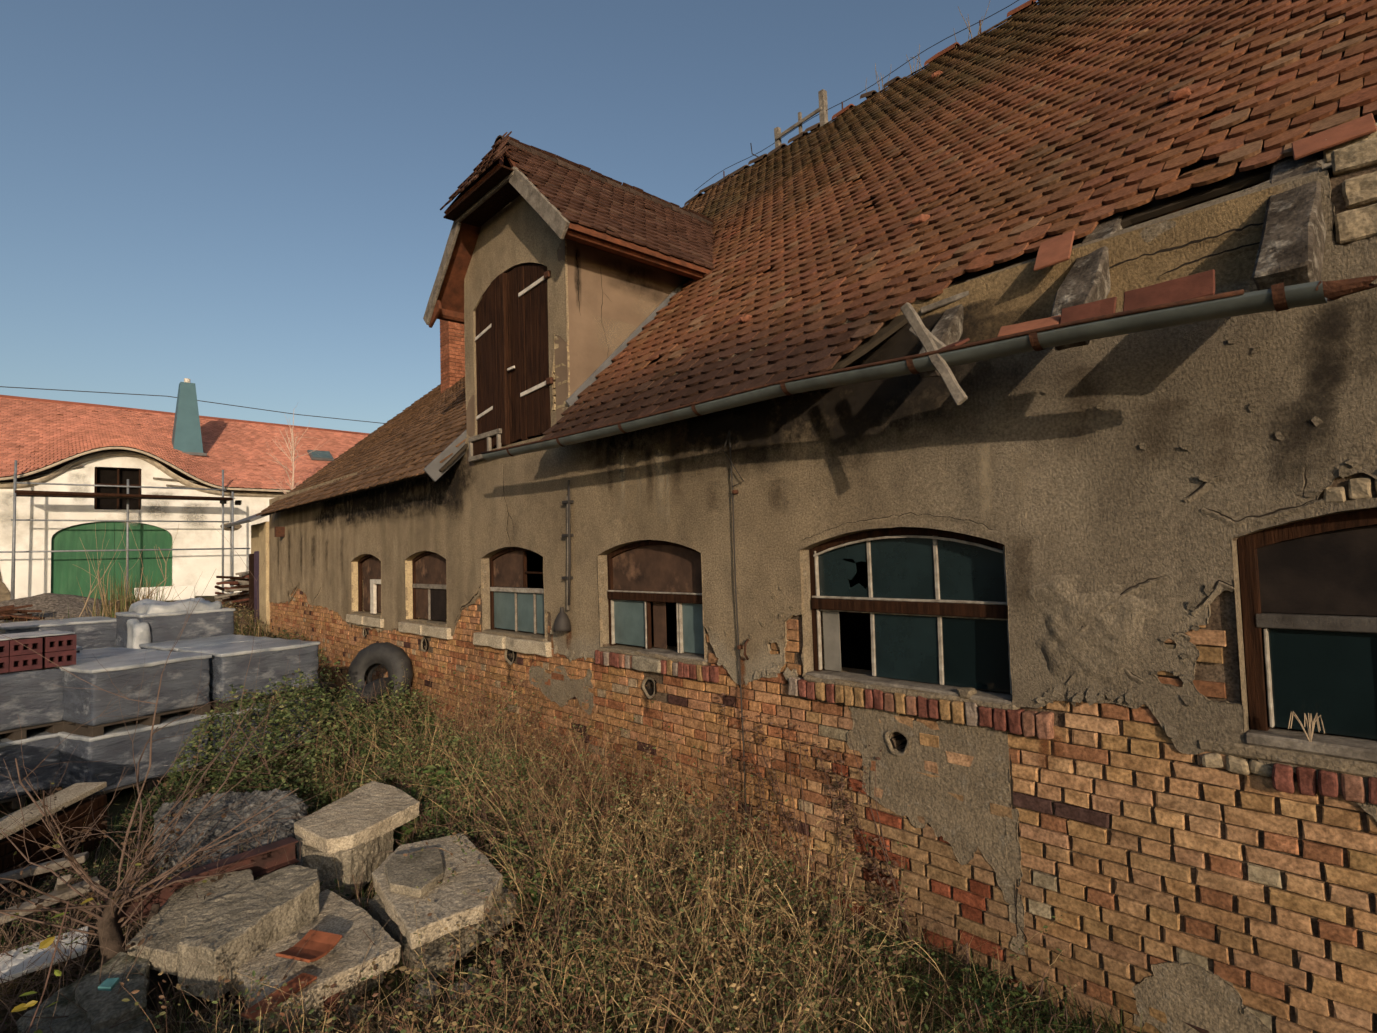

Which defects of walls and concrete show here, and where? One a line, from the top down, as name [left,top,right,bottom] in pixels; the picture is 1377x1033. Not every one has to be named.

crack [1109,222,1264,281]
leakage [959,302,995,341]
leakage [1291,304,1351,439]
leakage [589,312,991,514]
flaking render [1304,457,1377,502]
flaking render [744,605,803,685]
flaking render [1151,583,1227,706]
flaking render [1036,686,1148,707]